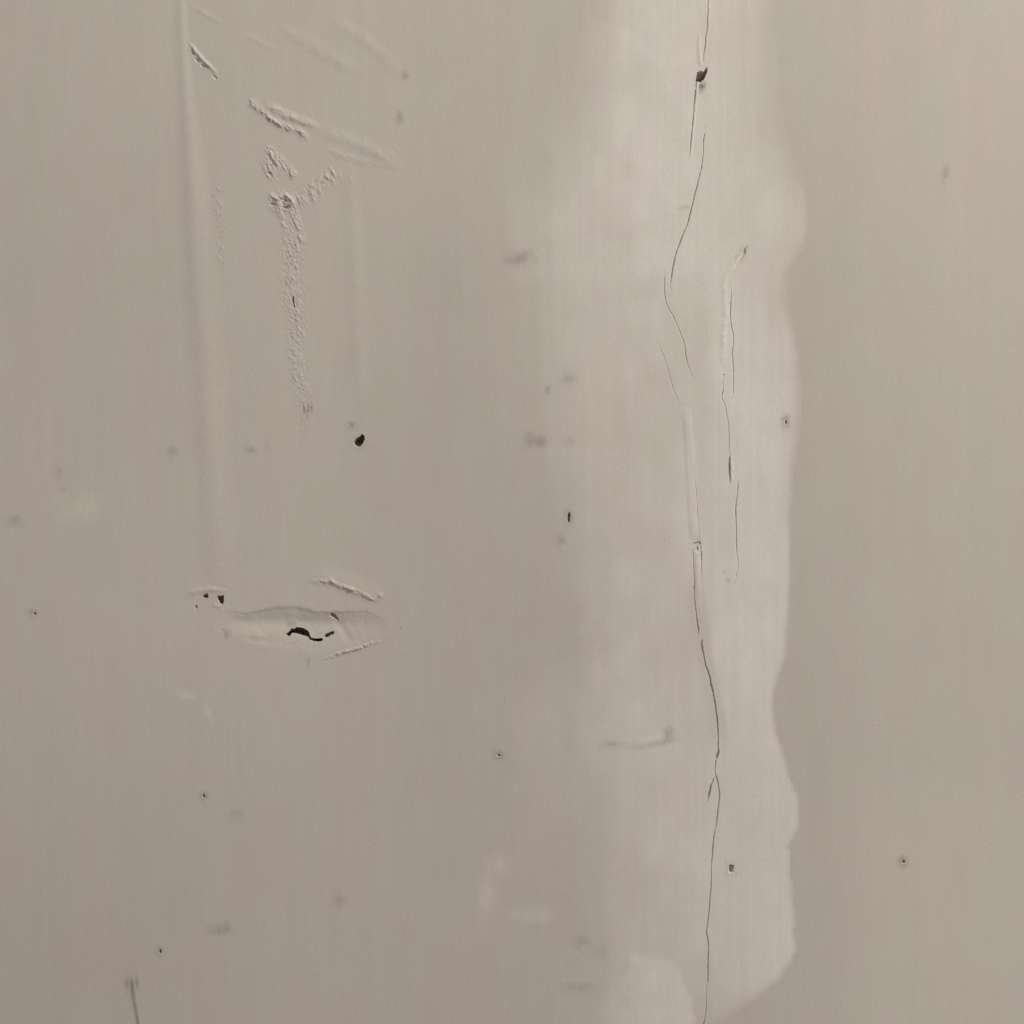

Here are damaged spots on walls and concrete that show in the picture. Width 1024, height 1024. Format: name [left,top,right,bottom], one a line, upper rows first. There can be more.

crack [658,0,722,1024]
crack [719,242,750,582]